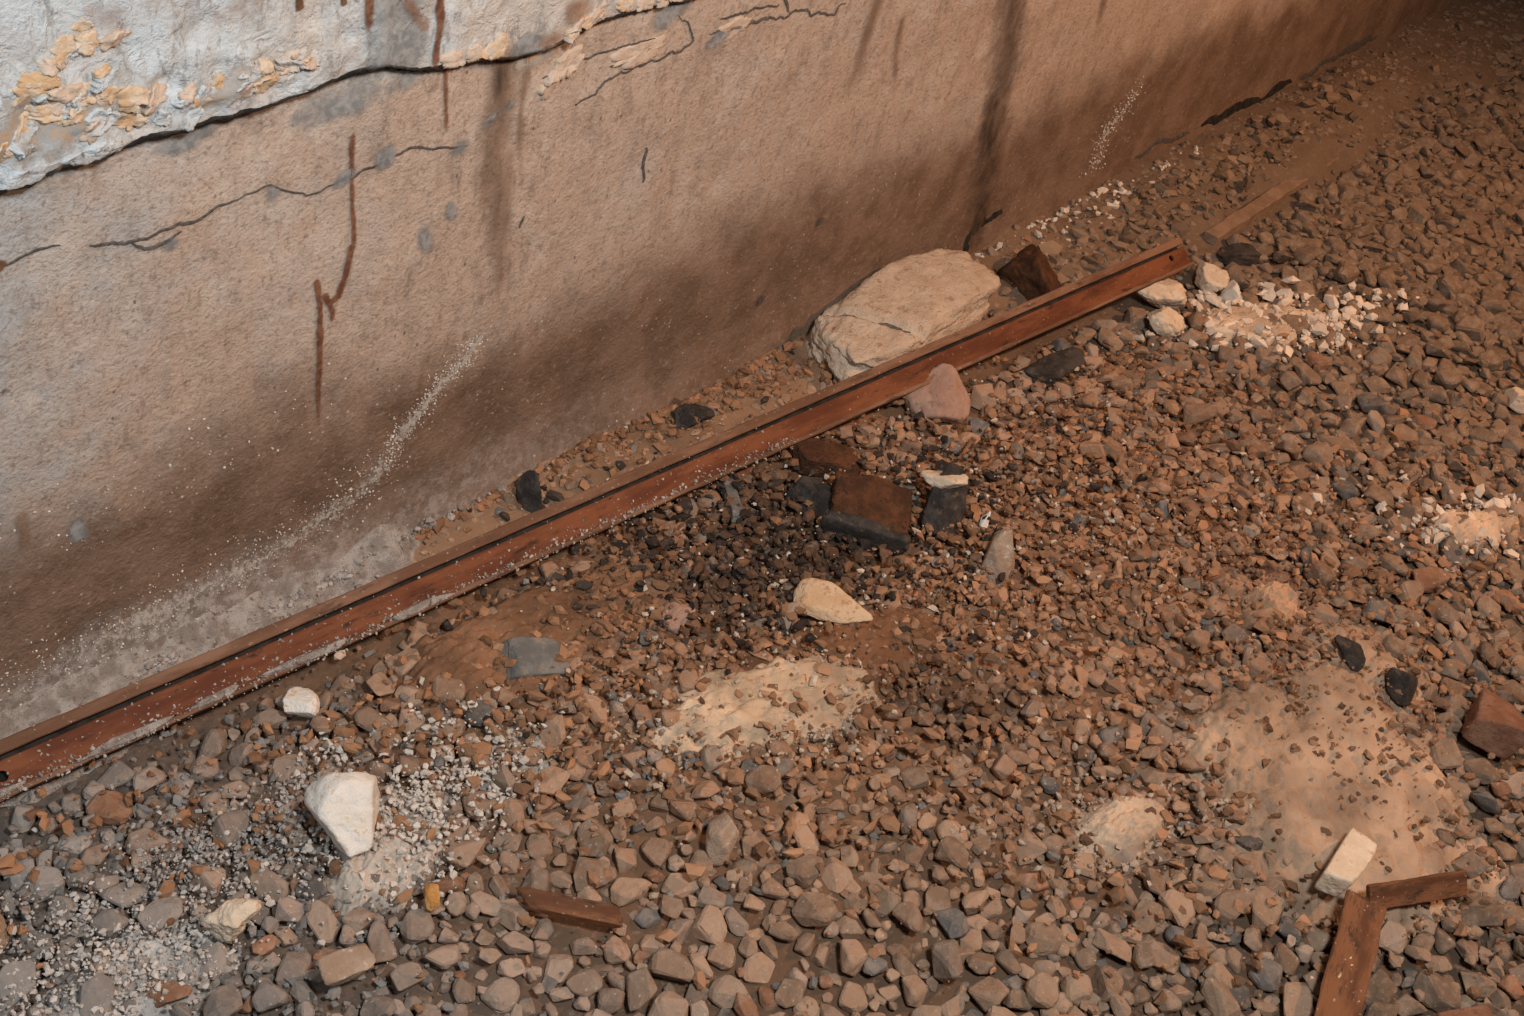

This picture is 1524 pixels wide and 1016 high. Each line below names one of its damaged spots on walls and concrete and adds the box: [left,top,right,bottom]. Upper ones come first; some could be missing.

spalling [0,18,321,163]
corrosion [365,0,374,30]
crack [0,0,847,191]
corrosion [400,0,448,128]
crack [5,145,467,266]
corrosion [314,135,356,416]
damp [0,321,493,710]